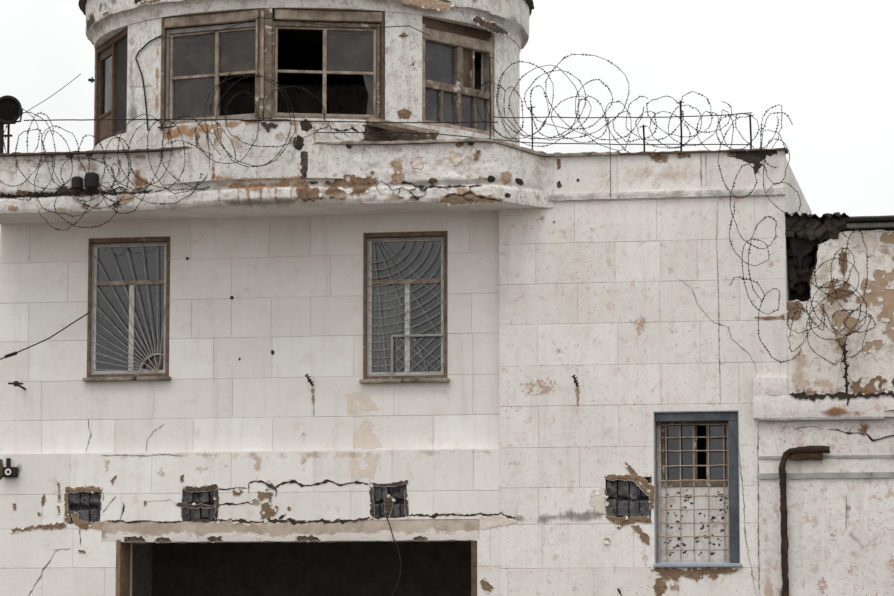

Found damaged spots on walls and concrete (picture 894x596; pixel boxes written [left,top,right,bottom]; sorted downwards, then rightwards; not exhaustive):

spalling [294,165,380,204]
peeling [826,231,894,355]
crack [789,391,894,411]
crack [86,420,179,456]
crack [792,424,879,441]
crack [101,491,180,524]
spalling [232,480,291,523]
crack [218,479,374,526]
spalling [589,481,650,545]
peeling [664,491,728,556]
crack [28,530,81,596]
spalling [649,567,740,596]